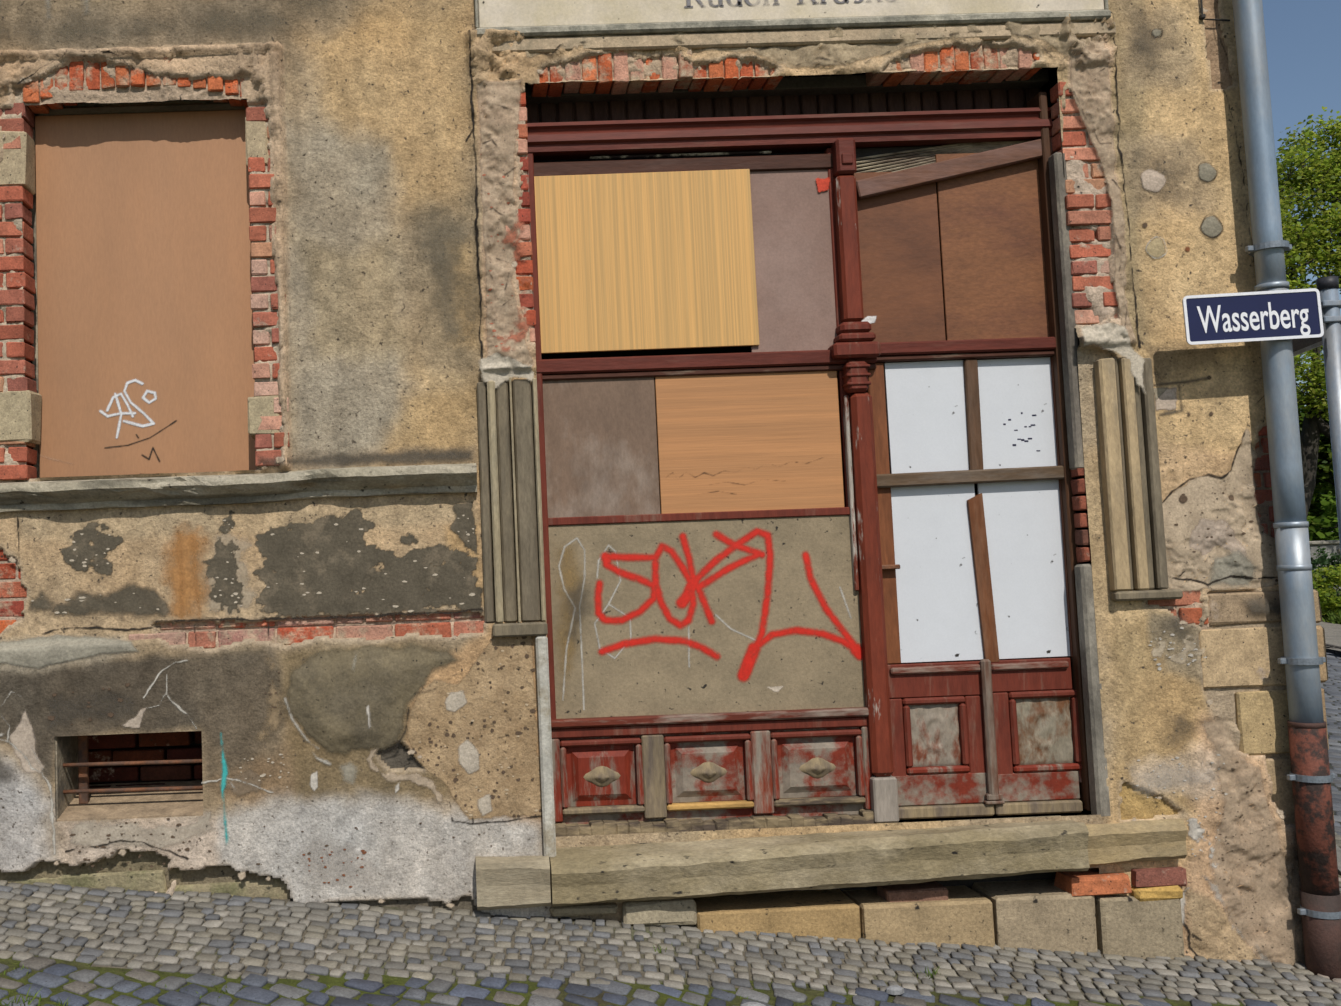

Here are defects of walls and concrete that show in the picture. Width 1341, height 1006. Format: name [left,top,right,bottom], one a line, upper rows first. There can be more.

flaking render [477,17,1145,391]
flaking render [0,57,290,482]
flaking render [0,550,27,634]
peeling [60,522,123,579]
flaking render [0,712,44,773]
flaking render [123,708,146,728]
peeling [128,502,542,857]
flaking render [0,812,293,899]
flaking render [302,845,477,912]